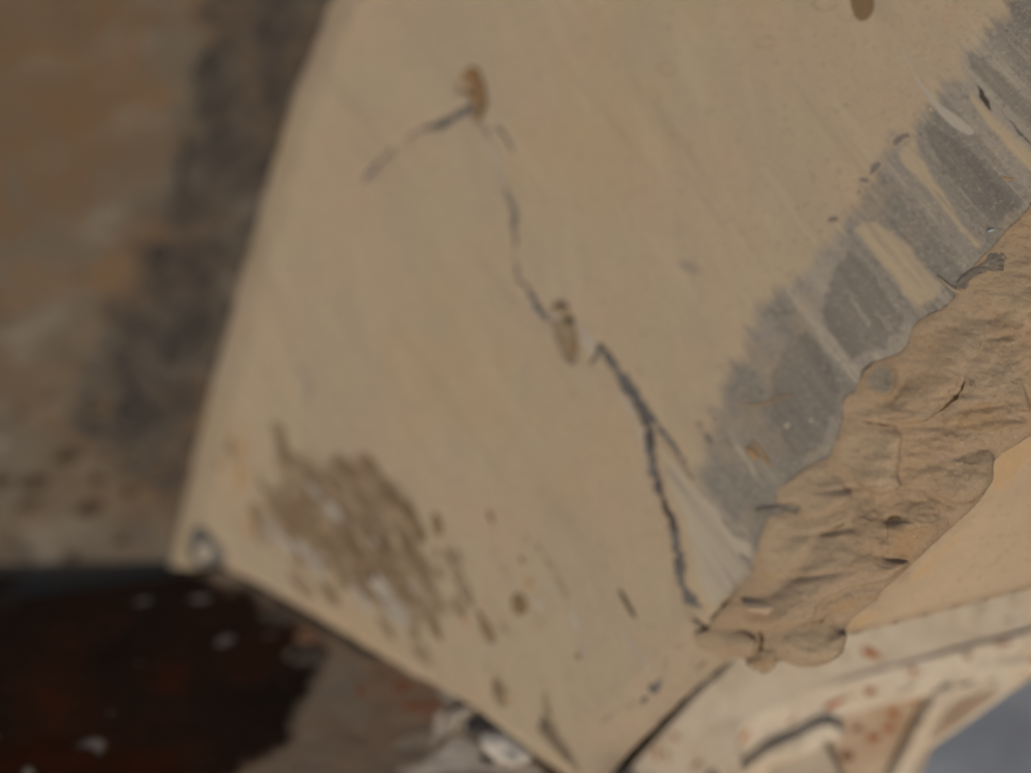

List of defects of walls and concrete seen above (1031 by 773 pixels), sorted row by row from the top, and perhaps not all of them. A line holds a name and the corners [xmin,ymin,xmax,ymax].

spalling [890,46,976,148]
crack [363,104,554,322]
crack [579,321,729,629]